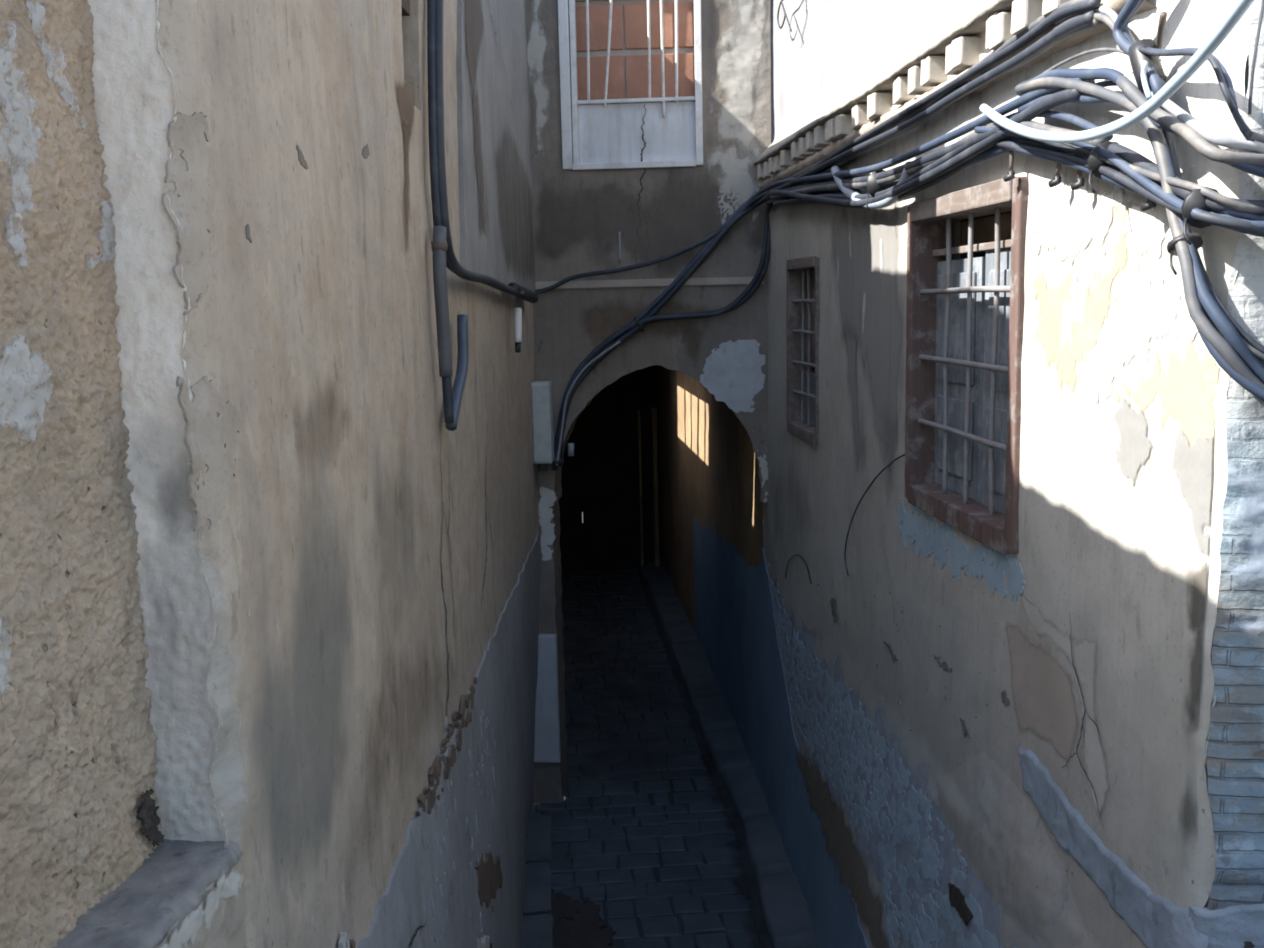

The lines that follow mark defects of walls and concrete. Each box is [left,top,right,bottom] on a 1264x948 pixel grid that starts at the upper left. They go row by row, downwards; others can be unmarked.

spalling [161,112,215,315]
crack [638,105,646,203]
peeling [708,0,765,224]
spalling [176,376,241,531]
peeling [700,340,765,413]
peeling [896,497,1026,601]
peeling [1031,169,1219,555]
crack [1061,622,1103,826]
spalling [796,749,889,948]
spalling [948,883,973,926]